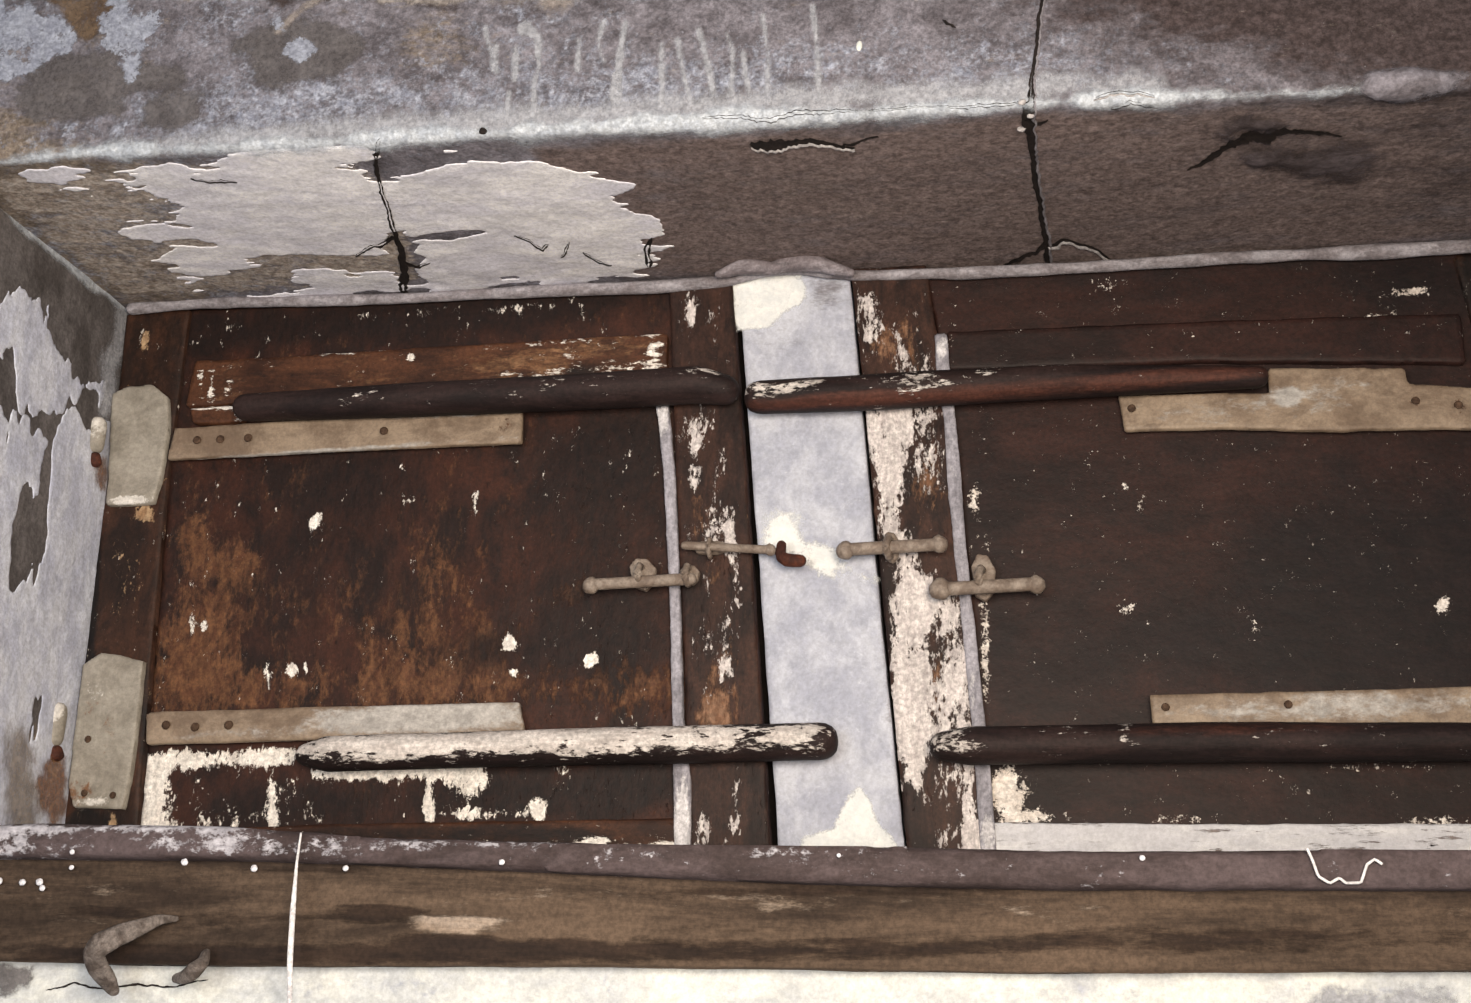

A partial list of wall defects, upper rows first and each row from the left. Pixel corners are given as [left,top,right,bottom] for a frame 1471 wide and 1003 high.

water stain [1,0,1232,164]
crack [702,0,1111,265]
water stain [1281,88,1362,97]
peeling [18,145,674,297]
crack [355,139,430,293]
peeling [0,286,111,825]